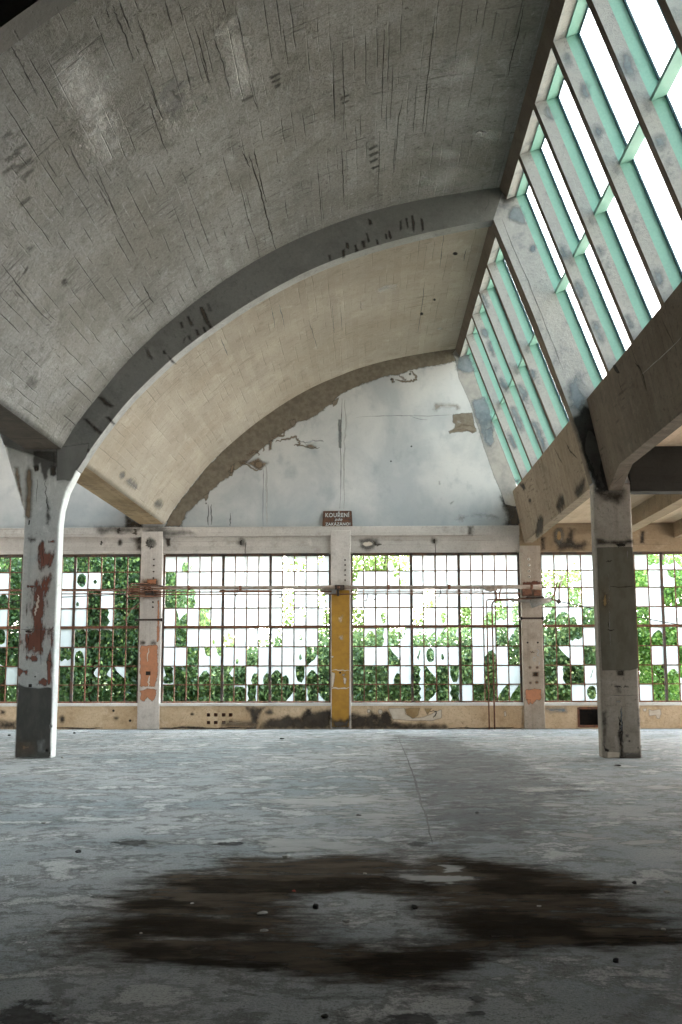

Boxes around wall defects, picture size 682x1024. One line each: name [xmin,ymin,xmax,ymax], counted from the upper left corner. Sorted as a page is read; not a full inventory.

crack [106,5,168,153]
crack [165,1,259,112]
crack [317,17,435,219]
crack [46,145,136,256]
crack [239,151,276,249]
leakage [501,196,526,223]
flaking render [166,349,517,546]
leakage [472,397,494,445]
leakage [500,377,624,512]
peeling [18,539,55,686]
peeling [140,645,158,701]
leakage [161,707,522,729]